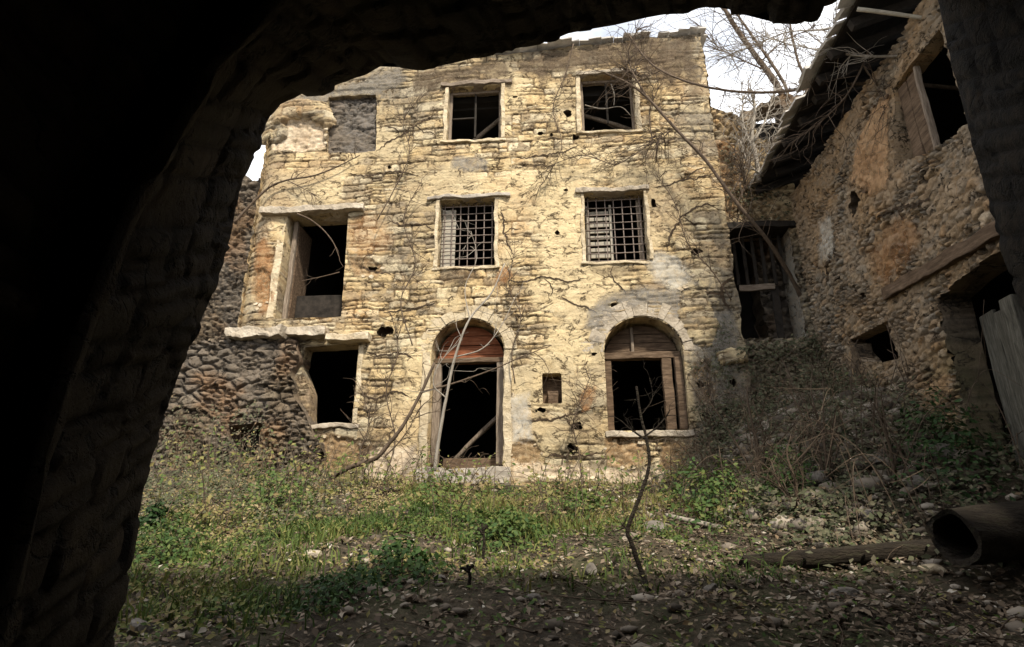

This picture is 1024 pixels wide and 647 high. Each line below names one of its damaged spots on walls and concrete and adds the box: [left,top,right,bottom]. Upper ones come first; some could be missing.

flaking render [851,94,889,194]
spalling [252,270,271,311]
leakage [588,289,681,328]